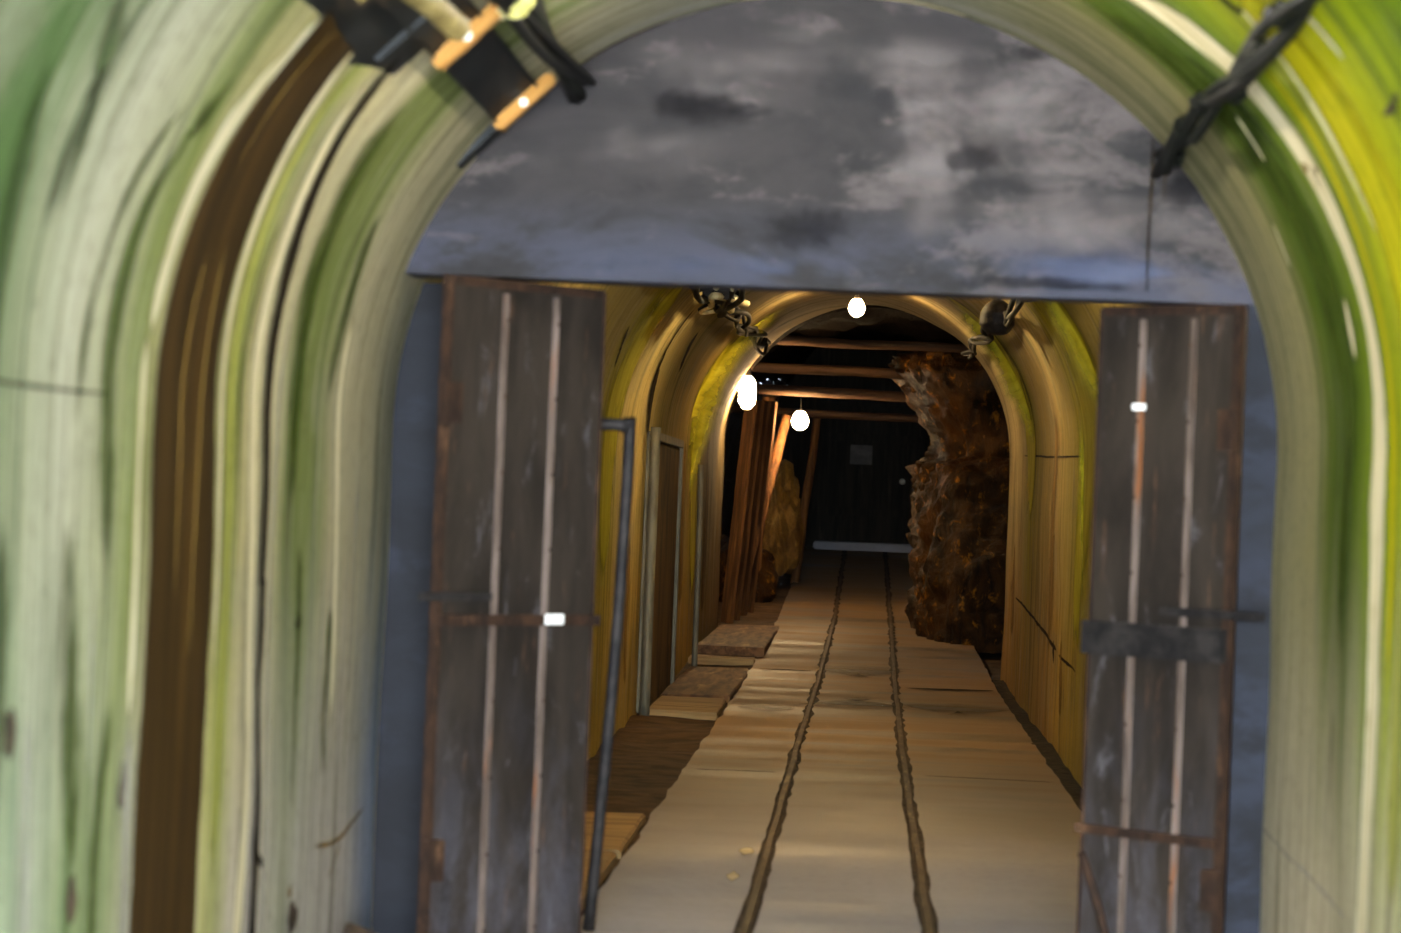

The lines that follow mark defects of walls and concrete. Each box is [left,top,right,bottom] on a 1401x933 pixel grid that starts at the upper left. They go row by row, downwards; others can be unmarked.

water stain [0,85,44,299]
water stain [51,0,150,201]
water stain [77,20,319,713]
water stain [212,51,395,933]
water stain [1089,0,1235,93]
water stain [1214,0,1401,933]
water stain [59,549,111,933]
water stain [121,745,131,933]